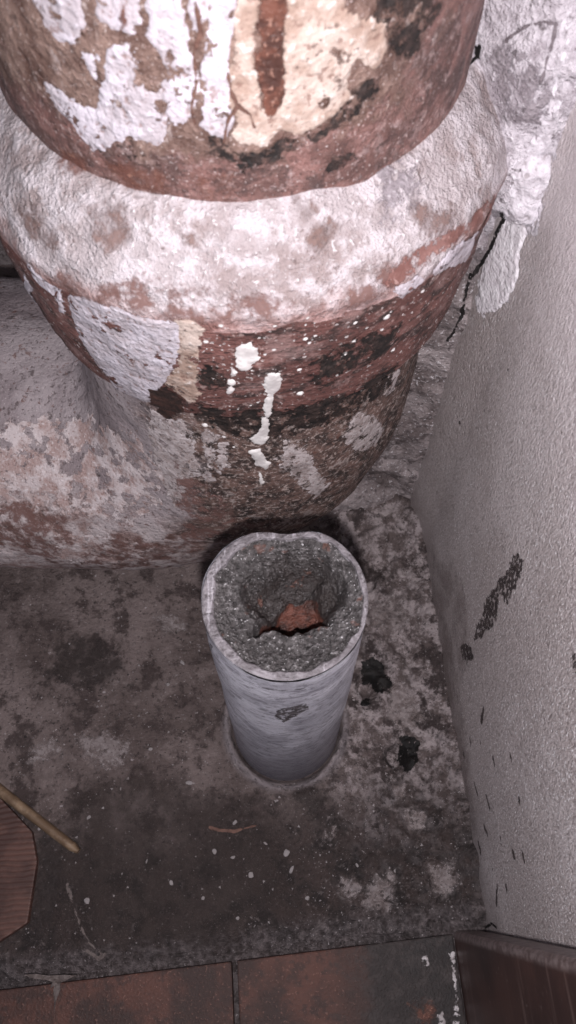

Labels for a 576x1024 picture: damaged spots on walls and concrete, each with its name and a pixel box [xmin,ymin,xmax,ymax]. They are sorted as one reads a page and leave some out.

peeling [32,0,388,152]
spalling [375,157,425,224]
peeling [393,231,479,299]
crack [446,213,505,342]
peeling [0,261,205,566]
peeling [342,411,385,451]
peeling [383,369,401,396]
peeling [273,435,331,500]